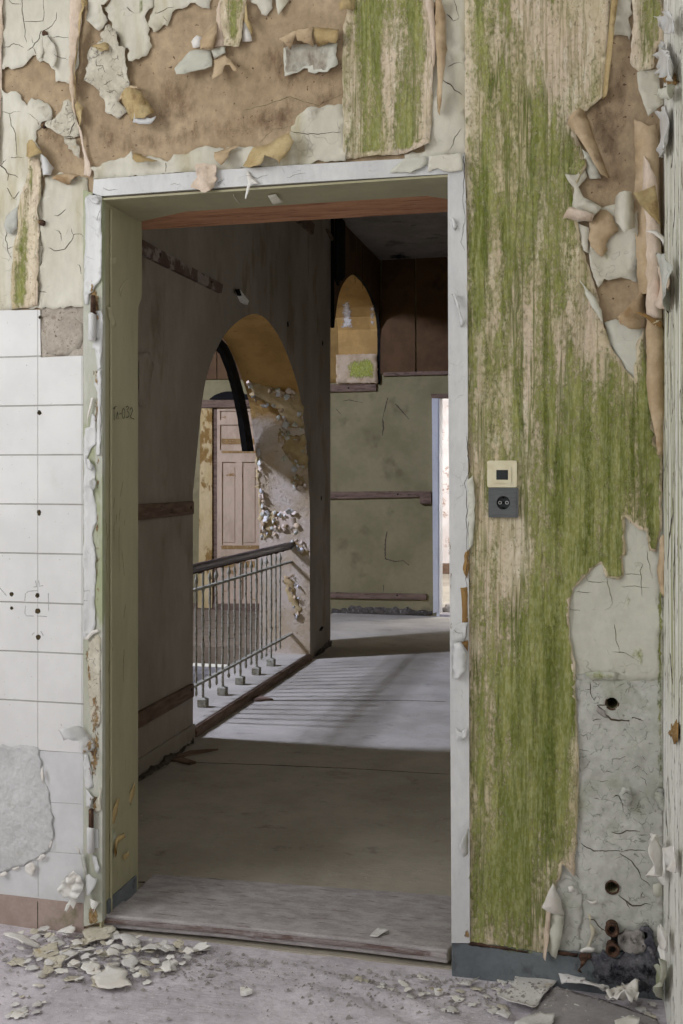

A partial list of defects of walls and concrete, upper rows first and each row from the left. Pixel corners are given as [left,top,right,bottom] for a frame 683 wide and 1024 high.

crack [0,112,39,198]
crack [3,0,68,59]
peeling [1,0,211,124]
peeling [279,27,339,76]
peeling [637,11,679,158]
leakage [471,200,488,294]
peeling [563,149,643,378]
peeling [0,88,347,812]
crack [569,514,675,661]
leakage [532,609,560,838]
crack [582,684,643,751]
crack [581,756,669,907]